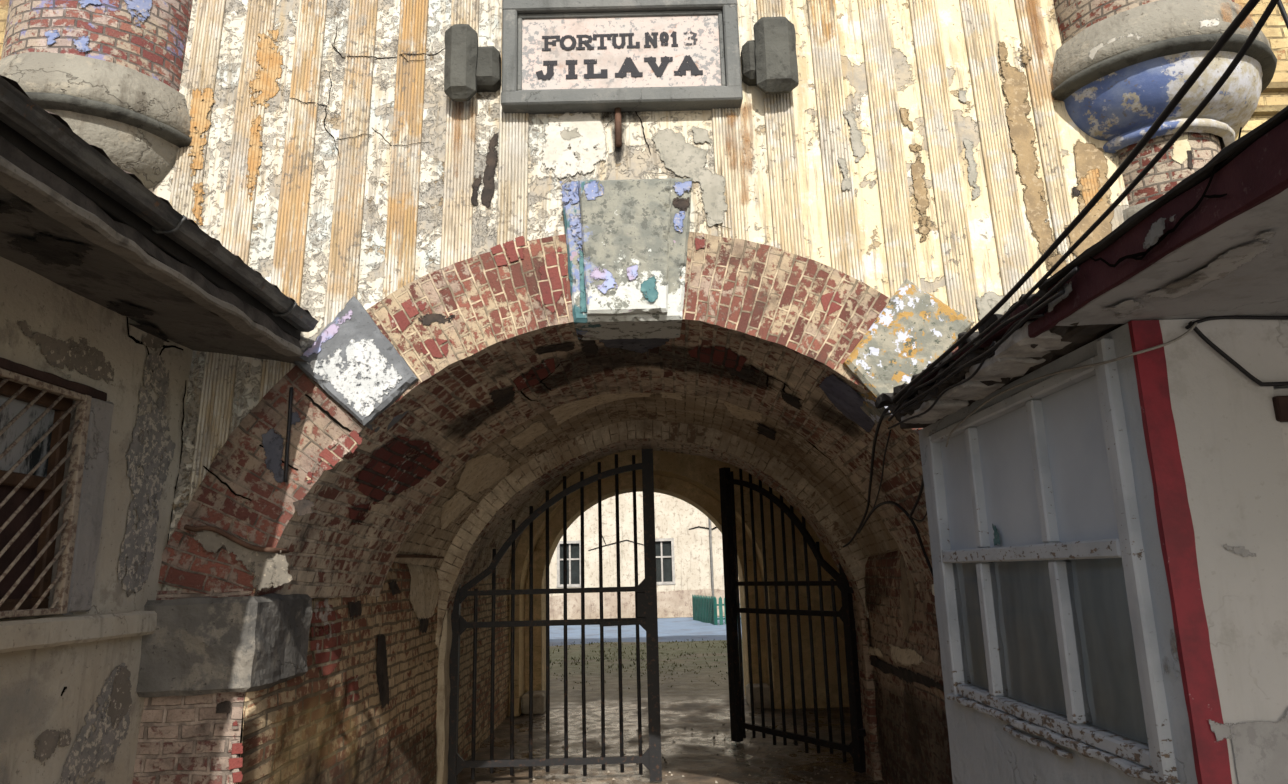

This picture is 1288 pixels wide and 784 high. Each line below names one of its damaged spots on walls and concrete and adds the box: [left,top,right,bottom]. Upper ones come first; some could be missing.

peeling [188,88,216,225]
peeling [245,29,283,201]
crack [292,27,445,158]
peeling [672,181,718,250]
spalling [900,108,931,242]
spalling [998,41,1114,313]
crack [126,316,184,373]
flaking render [388,298,455,358]
flaking render [489,180,658,410]
peeling [106,303,176,597]
crack [167,382,252,543]
peeling [33,663,132,784]